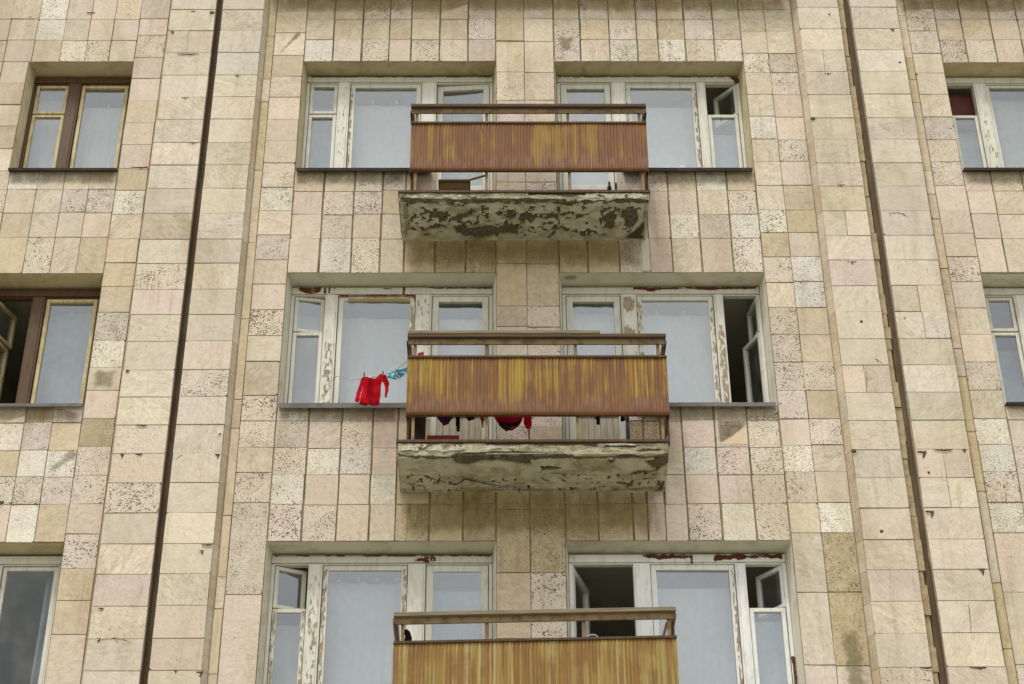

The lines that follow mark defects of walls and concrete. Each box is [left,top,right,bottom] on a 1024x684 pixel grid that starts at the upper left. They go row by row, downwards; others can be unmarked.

spalling [400,193,648,238]
peeling [322,342,334,403]
peeling [710,307,729,402]
spalling [399,443,668,491]
corrosion [643,554,693,564]
corrosion [713,553,783,561]